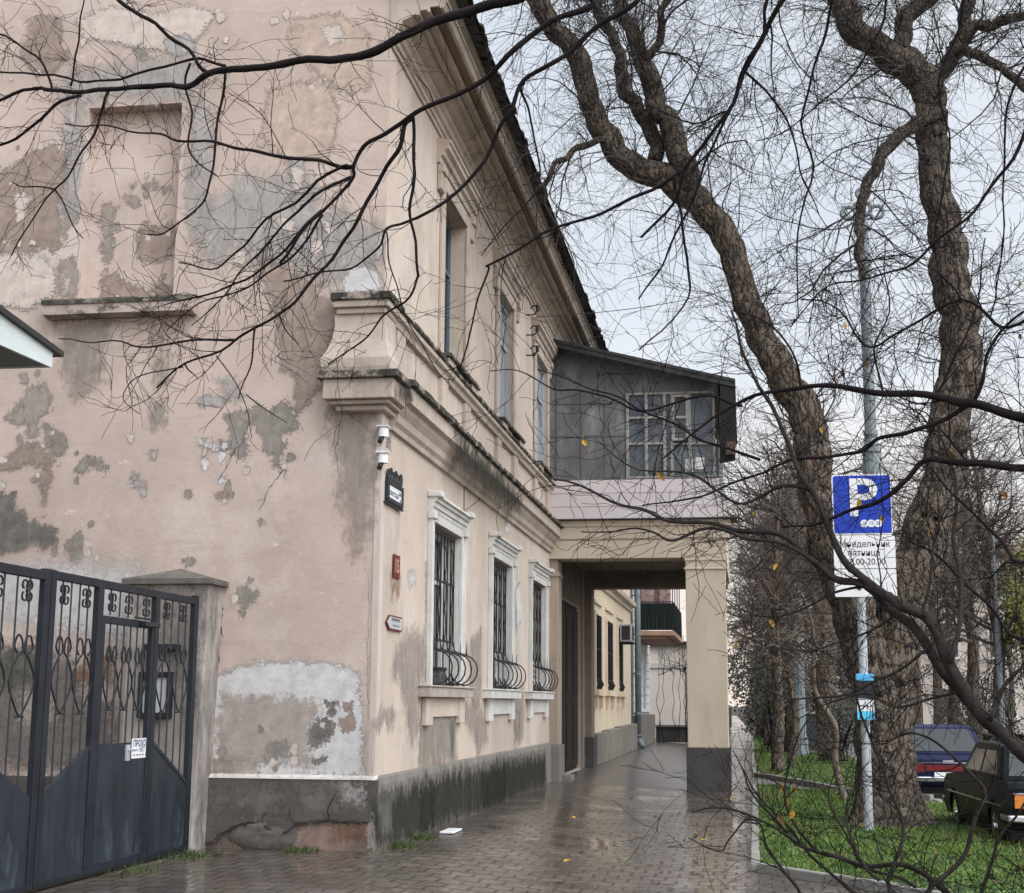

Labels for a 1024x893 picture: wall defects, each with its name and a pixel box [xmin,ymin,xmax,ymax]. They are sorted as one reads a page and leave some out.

peeling [19,1,229,74]
peeling [256,8,373,182]
peeling [0,143,82,314]
peeling [196,254,349,504]
peeling [0,369,110,565]
leakage [325,404,377,556]
peeling [230,577,262,621]
crack [205,793,376,843]
peeling [257,700,356,773]
leakage [208,628,488,829]
leakage [378,791,393,840]
leakage [482,766,506,808]